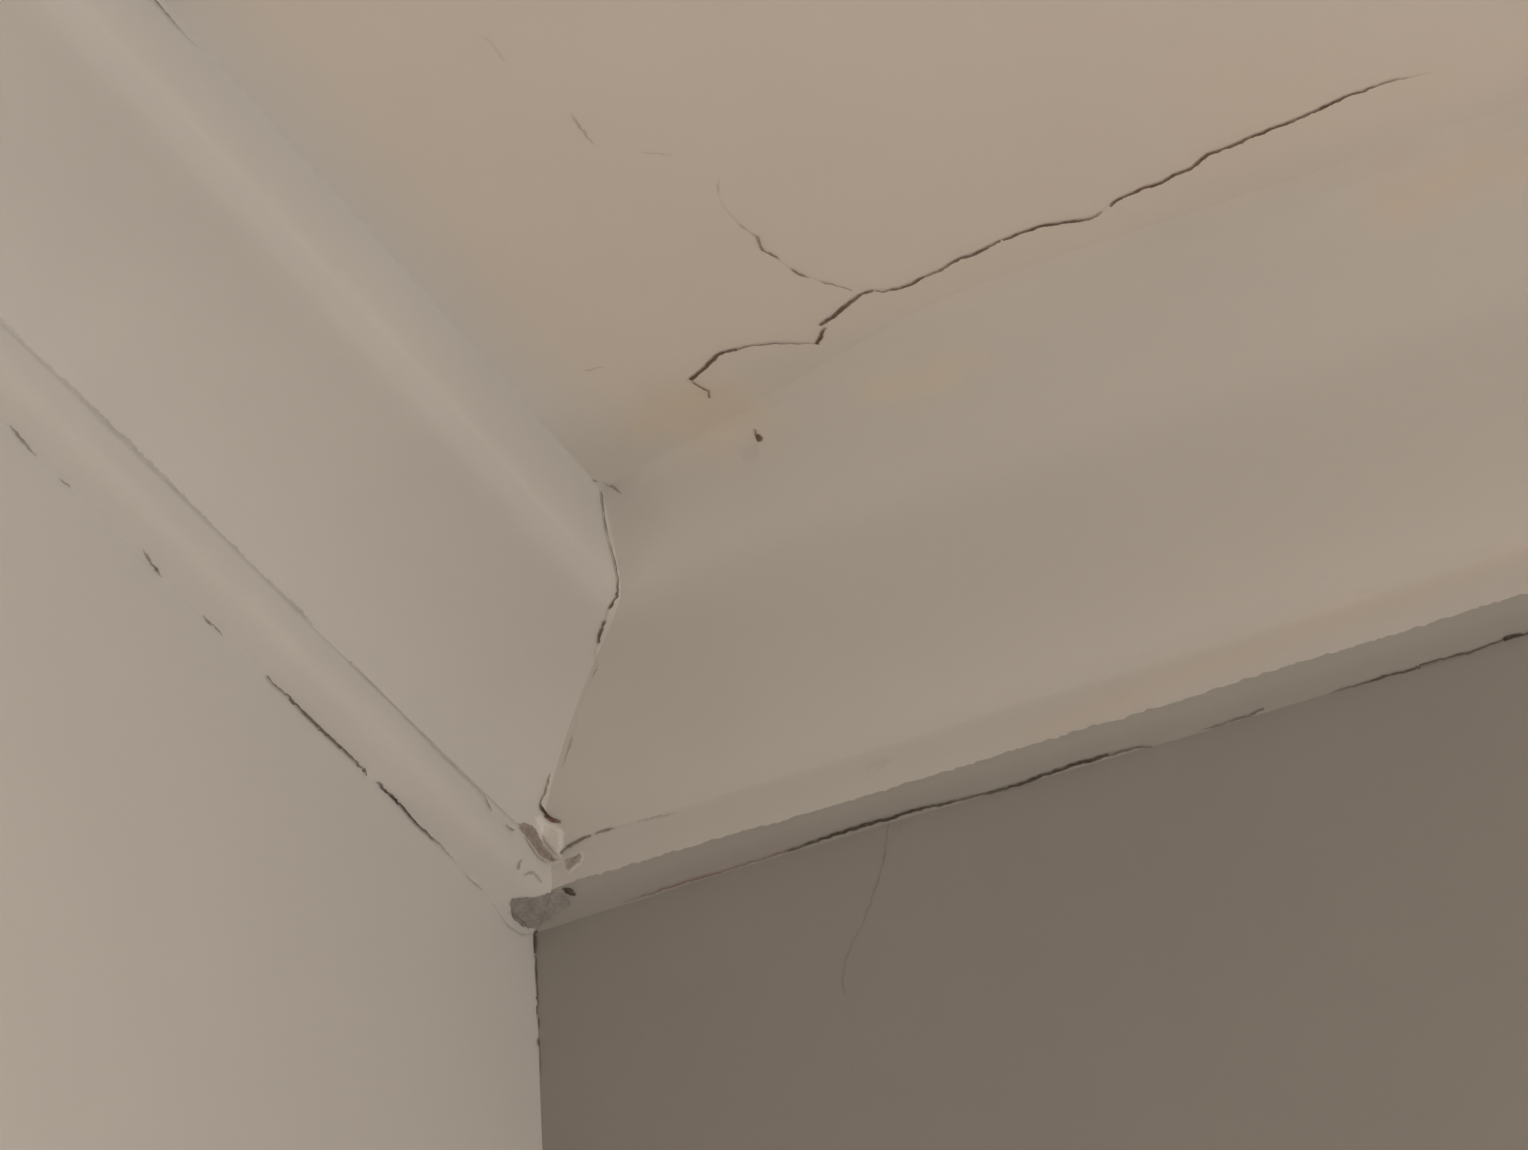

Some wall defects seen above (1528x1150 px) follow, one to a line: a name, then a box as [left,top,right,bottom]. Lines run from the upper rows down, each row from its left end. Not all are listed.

crack [689,80,1395,398]
crack [597,492,619,643]
crack [1366,633,1528,683]
crack [268,676,434,840]
spalling [510,813,585,929]
crack [540,777,610,854]
crack [788,746,1148,852]